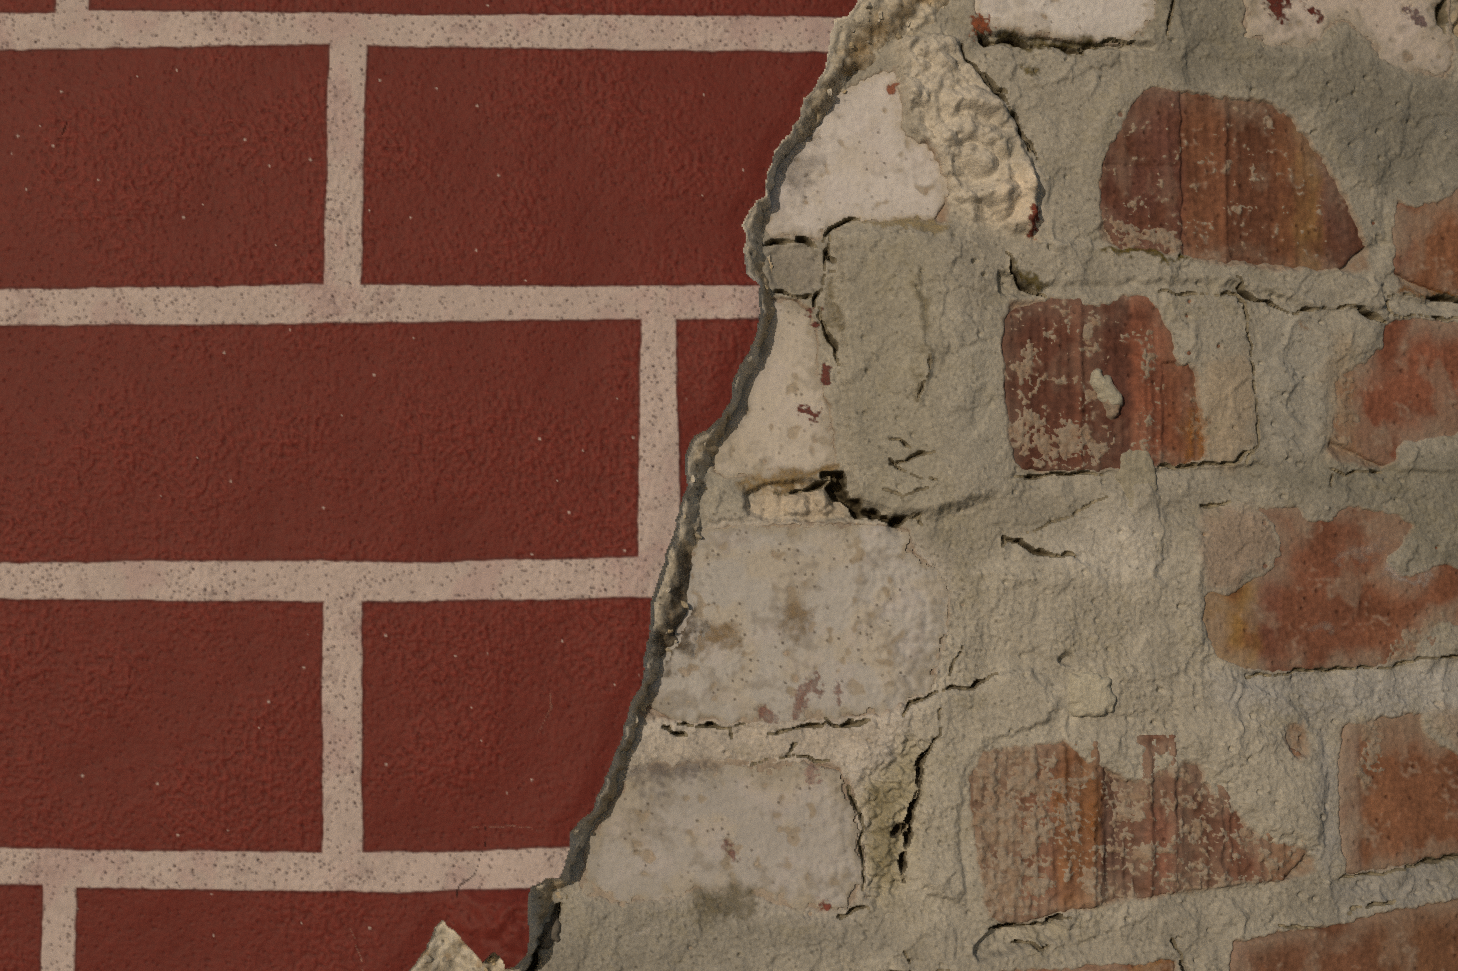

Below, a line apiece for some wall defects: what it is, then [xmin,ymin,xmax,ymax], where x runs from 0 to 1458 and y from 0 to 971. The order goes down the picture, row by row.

peeling [971,0,1156,44]
crack [960,0,1175,160]
peeling [1244,0,1454,78]
peeling [1027,204,1040,237]
crack [762,216,860,374]
crack [915,353,933,402]
peeling [409,0,952,971]
crack [773,438,938,528]
crack [661,645,999,920]